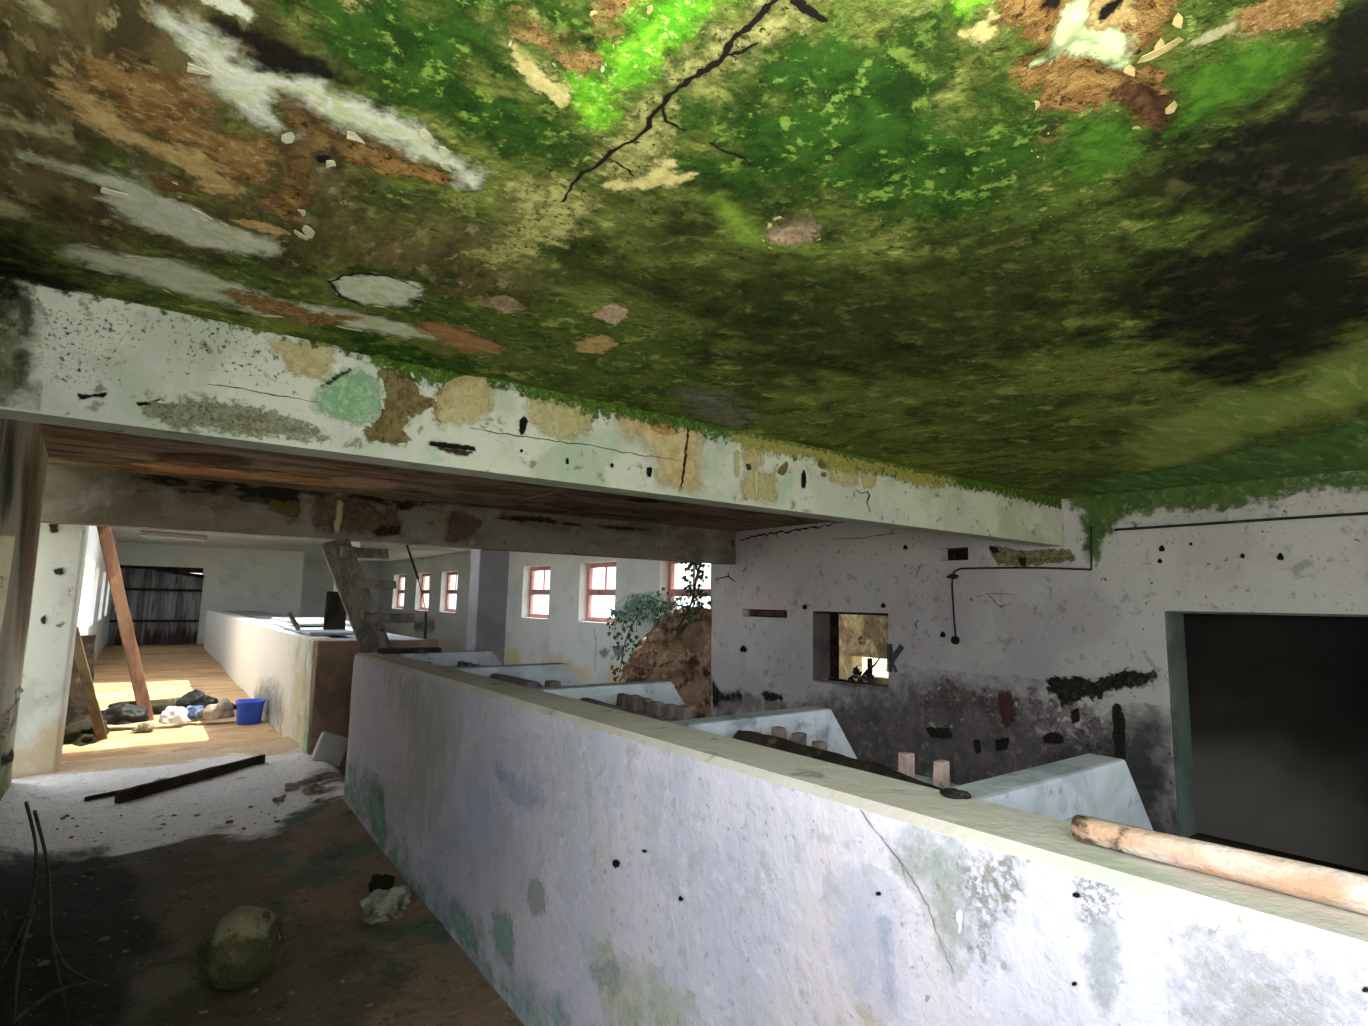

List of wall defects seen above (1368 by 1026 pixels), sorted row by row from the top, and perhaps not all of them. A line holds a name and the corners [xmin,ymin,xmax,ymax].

peeling [201,0,254,21]
spalling [1098,0,1123,23]
peeling [1123,12,1238,77]
peeling [152,9,482,189]
crack [561,0,828,202]
peeling [1165,100,1177,114]
peeling [16,151,315,256]
leakage [1105,0,1368,387]
peeling [64,244,441,340]
spalling [364,368,435,447]
leakage [820,681,1175,832]
spalling [921,667,1157,761]